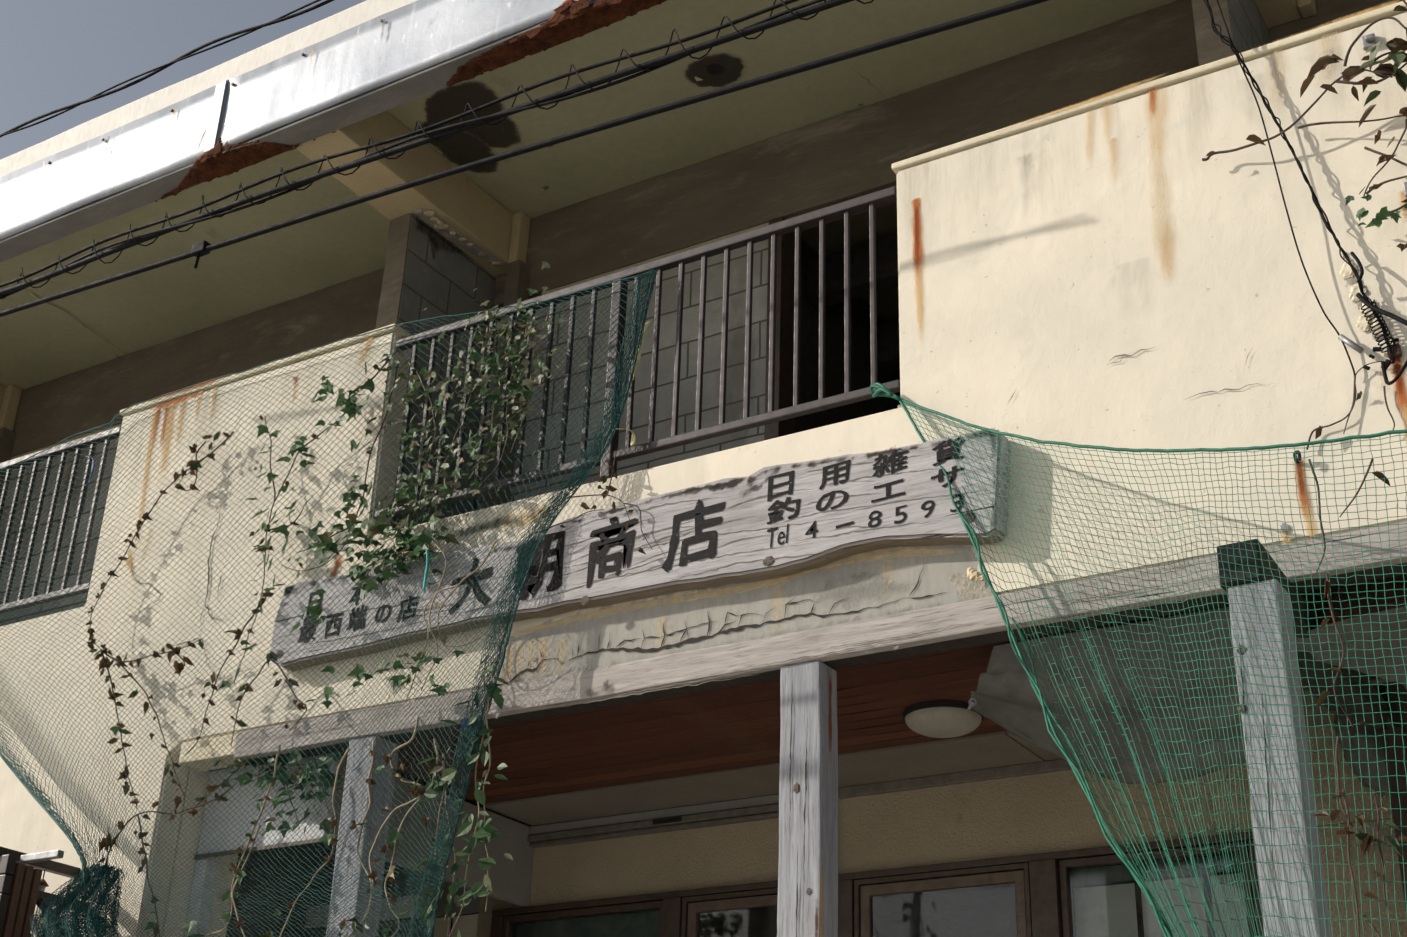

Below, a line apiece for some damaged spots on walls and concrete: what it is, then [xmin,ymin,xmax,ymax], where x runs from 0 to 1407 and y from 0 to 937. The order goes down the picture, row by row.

rust [912,198,923,325]
crack [1107,347,1154,365]
crack [1186,349,1273,399]
rust [1391,357,1407,435]
rust [140,379,218,520]
rust [1295,460,1315,537]
crack [504,565,946,685]